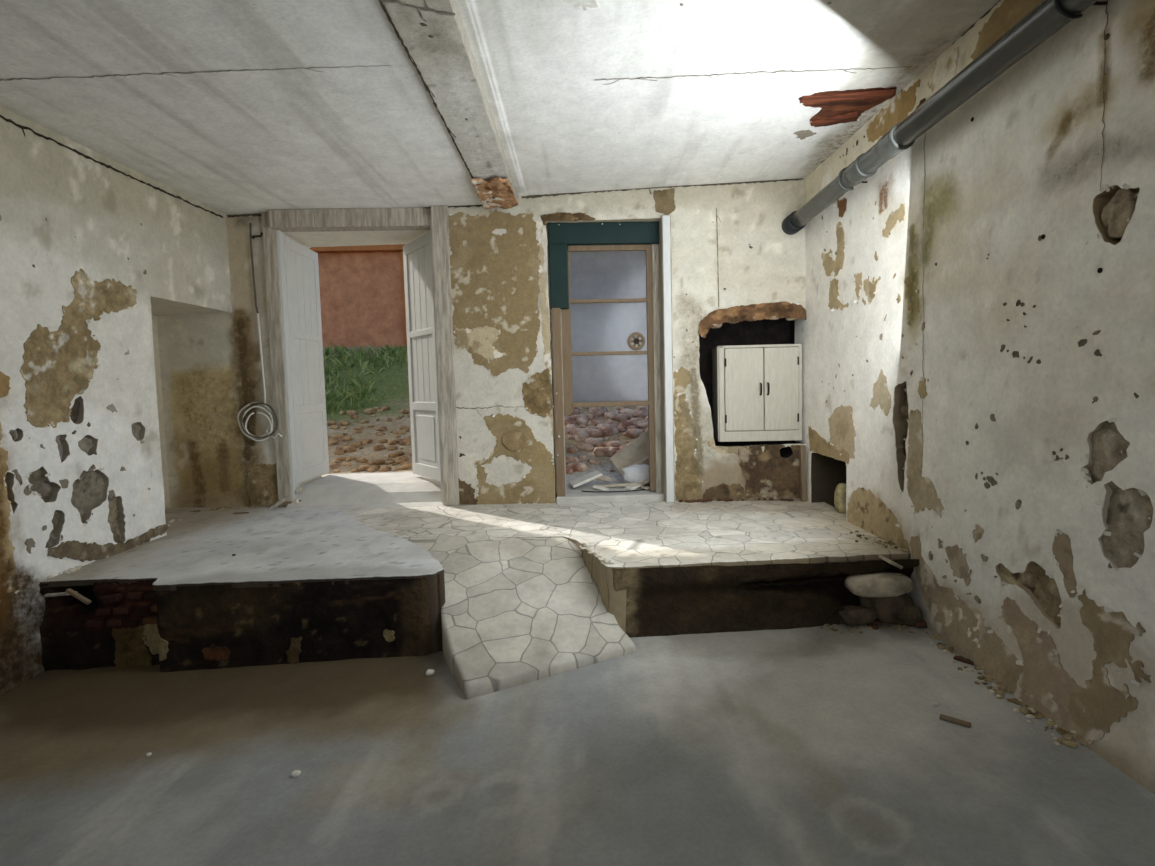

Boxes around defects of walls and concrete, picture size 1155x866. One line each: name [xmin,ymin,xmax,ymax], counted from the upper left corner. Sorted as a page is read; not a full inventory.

crack [0,0,482,218]
peeling [839,0,1043,158]
crack [951,0,1000,45]
peeling [0,269,168,610]
leakage [232,317,259,474]
peeling [448,178,603,505]
peeling [821,198,925,345]
peeling [873,187,906,238]
spalling [1000,344,1041,364]
spalling [1078,330,1102,356]
spalling [1097,183,1140,240]
peeling [838,369,1153,746]